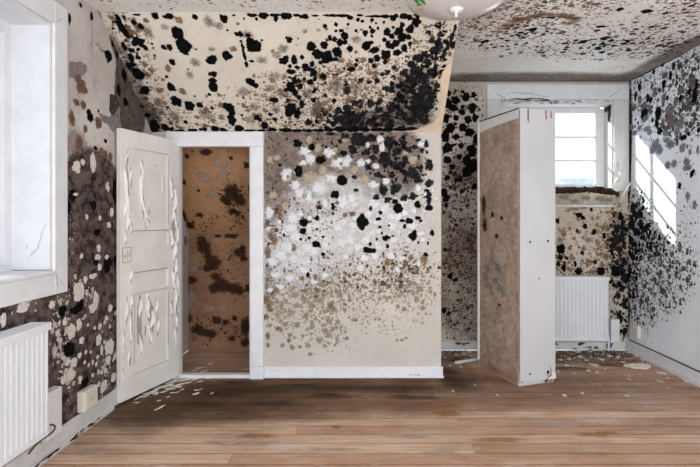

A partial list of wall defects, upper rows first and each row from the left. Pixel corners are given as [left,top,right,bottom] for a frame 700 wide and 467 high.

leakage [0,74,117,425]
peeling [136,301,152,344]
leakage [90,0,700,356]